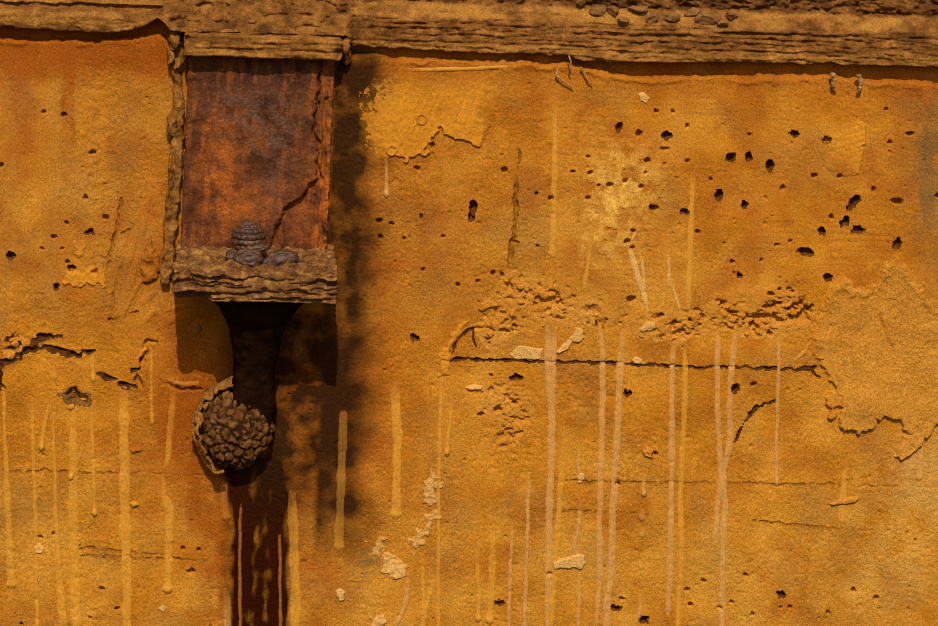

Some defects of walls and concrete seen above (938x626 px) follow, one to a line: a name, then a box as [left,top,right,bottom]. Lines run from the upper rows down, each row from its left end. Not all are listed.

crack [0,333,159,390]
rust [128,303,303,626]
crack [450,327,821,378]
flaking render [436,252,938,461]